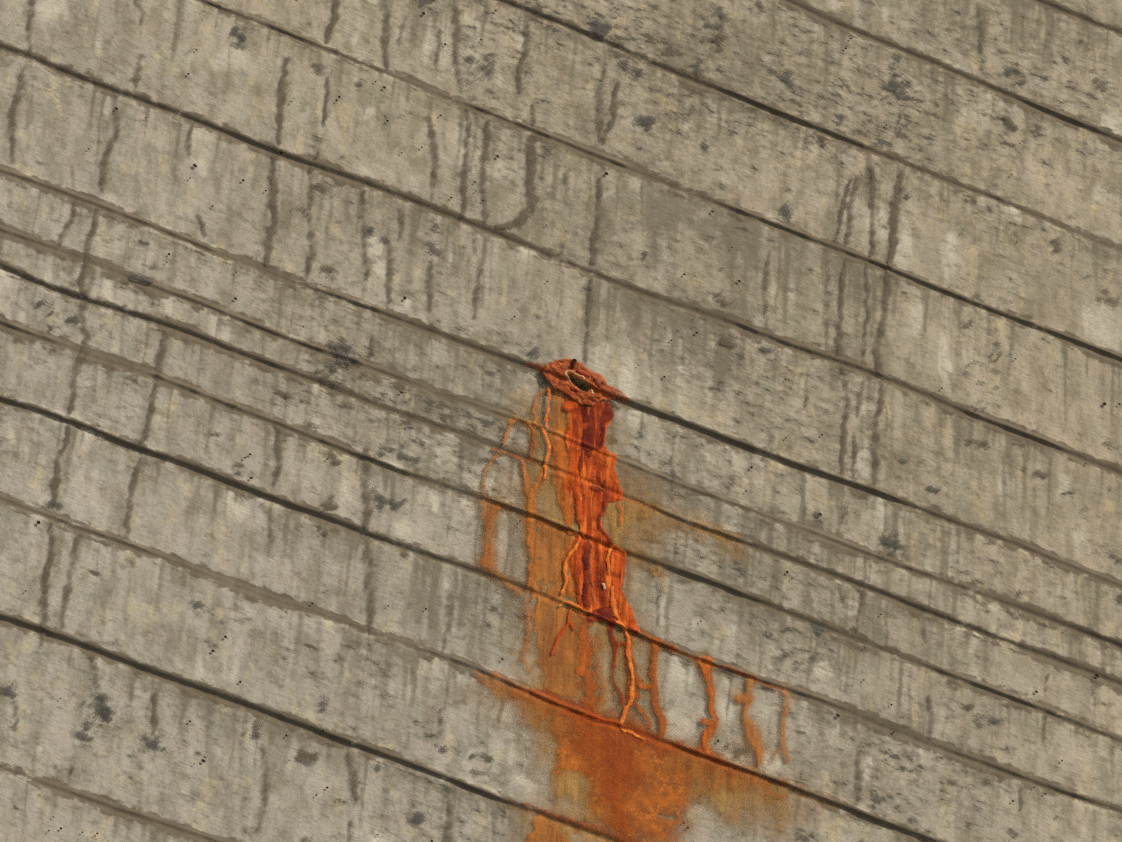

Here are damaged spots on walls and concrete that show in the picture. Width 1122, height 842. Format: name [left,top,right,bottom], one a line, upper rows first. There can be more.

leakage [312,62,330,126]
leakage [326,0,340,43]
leakage [436,3,497,89]
leakage [264,57,290,267]
leakage [292,150,336,279]
leakage [363,190,405,302]
leakage [427,116,439,199]
leakage [461,103,539,229]
spalling [526,358,630,406]
leakage [826,259,864,475]
leakage [836,167,911,483]
corrosion [480,387,789,842]